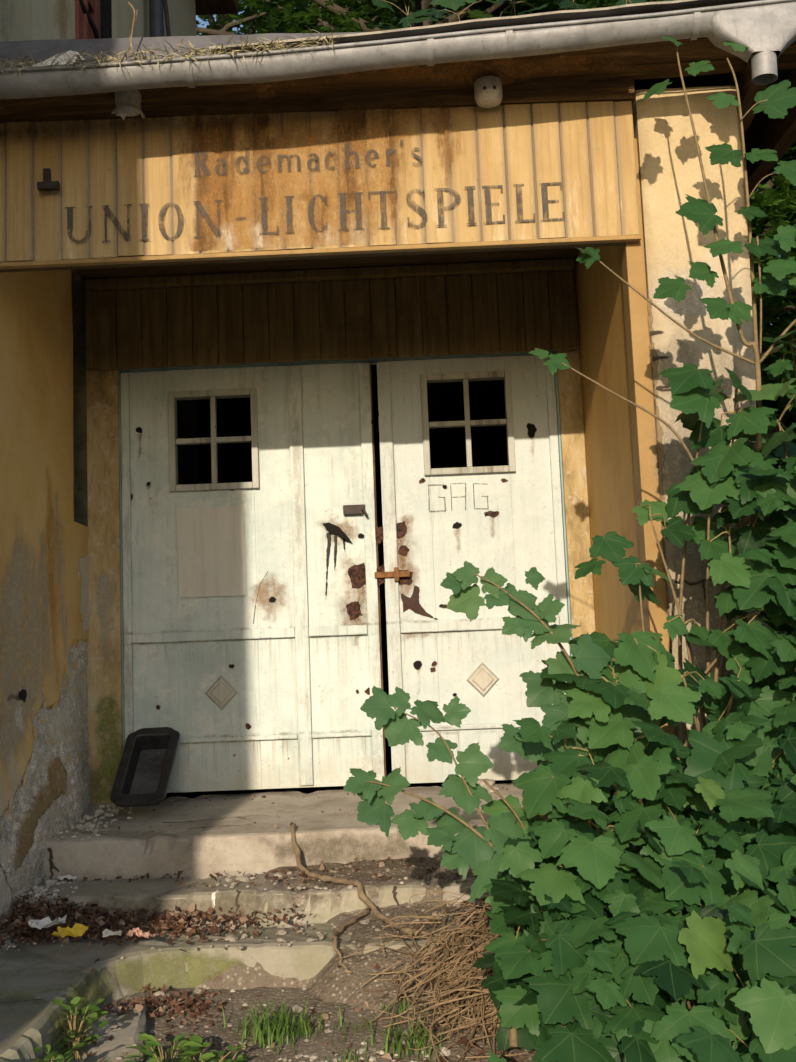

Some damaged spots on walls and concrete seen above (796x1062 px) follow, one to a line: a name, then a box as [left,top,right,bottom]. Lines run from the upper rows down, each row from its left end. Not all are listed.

corrosion [343,563,385,625]
corrosion [375,526,384,544]
corrosion [396,519,415,594]
damp [0,523,62,761]
flaking render [0,554,171,935]